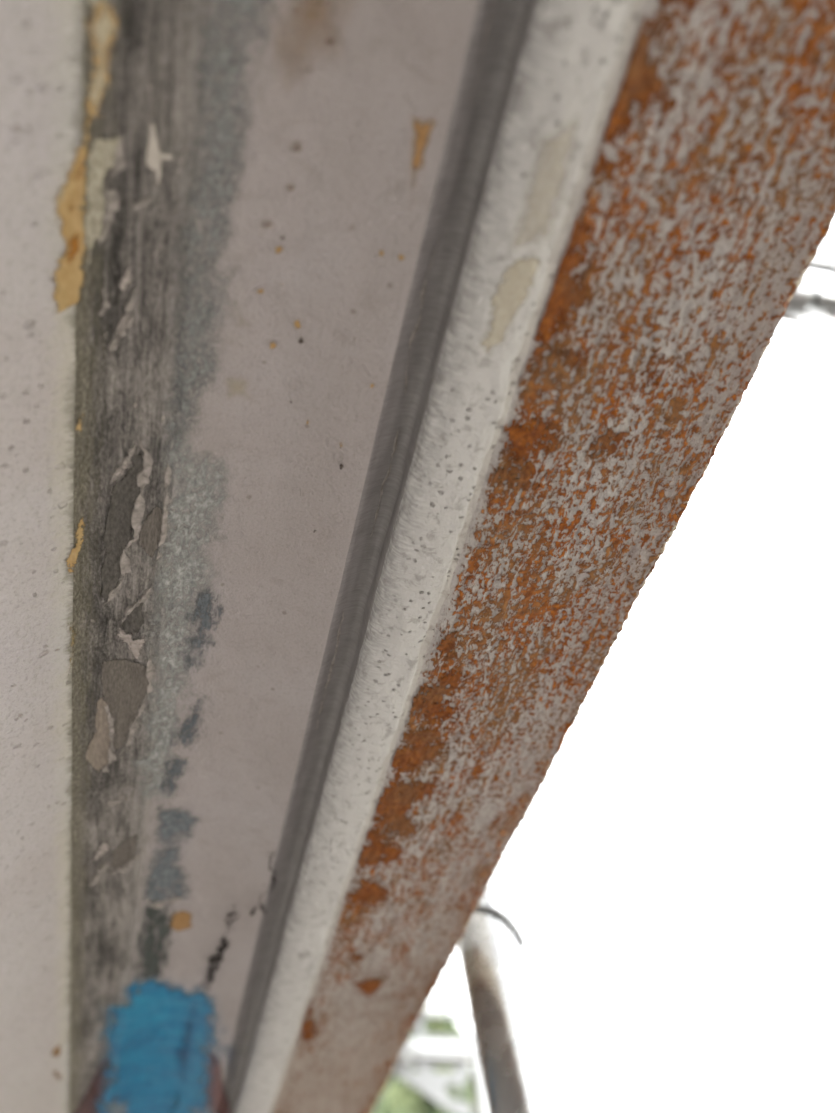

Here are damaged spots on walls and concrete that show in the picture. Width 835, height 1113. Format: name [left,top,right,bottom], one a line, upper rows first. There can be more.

peeling [99,264,137,355]
peeling [52,1,188,313]
peeling [84,435,175,778]
water stain [134,0,271,981]
rust [277,0,835,1113]
crack [202,853,276,991]